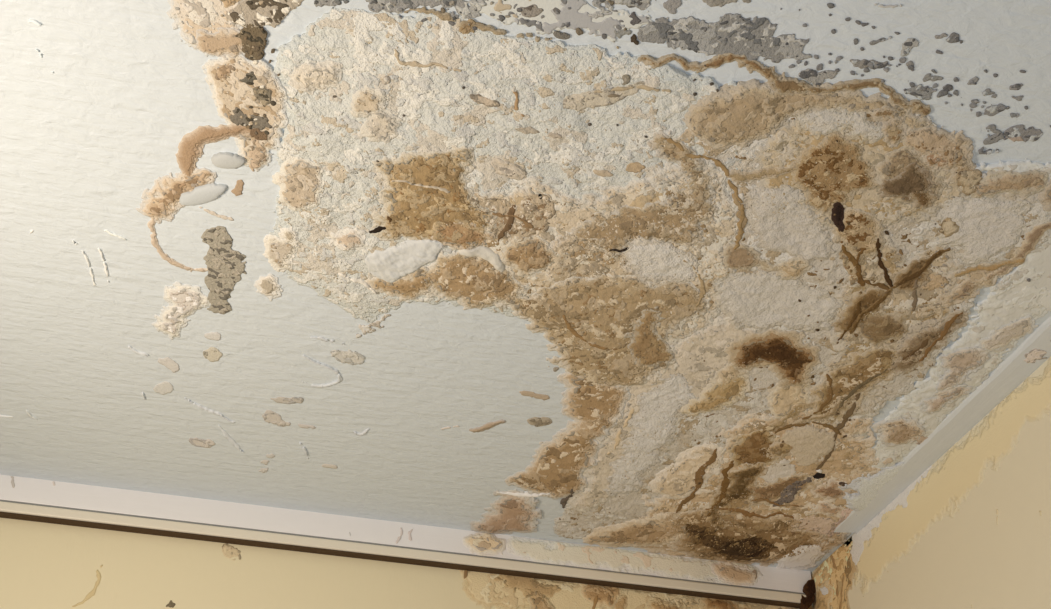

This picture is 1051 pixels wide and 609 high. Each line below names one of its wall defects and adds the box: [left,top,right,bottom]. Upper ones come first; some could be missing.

water stain [394,47,462,72]
water stain [404,7,552,42]
water stain [136,0,343,340]
peeling [226,0,1051,323]
spalling [201,226,246,314]
water stain [203,332,223,362]
water stain [326,62,1051,609]
water stain [262,397,316,429]
peeling [838,238,1051,565]
peeling [773,424,841,507]
water stain [222,543,241,560]